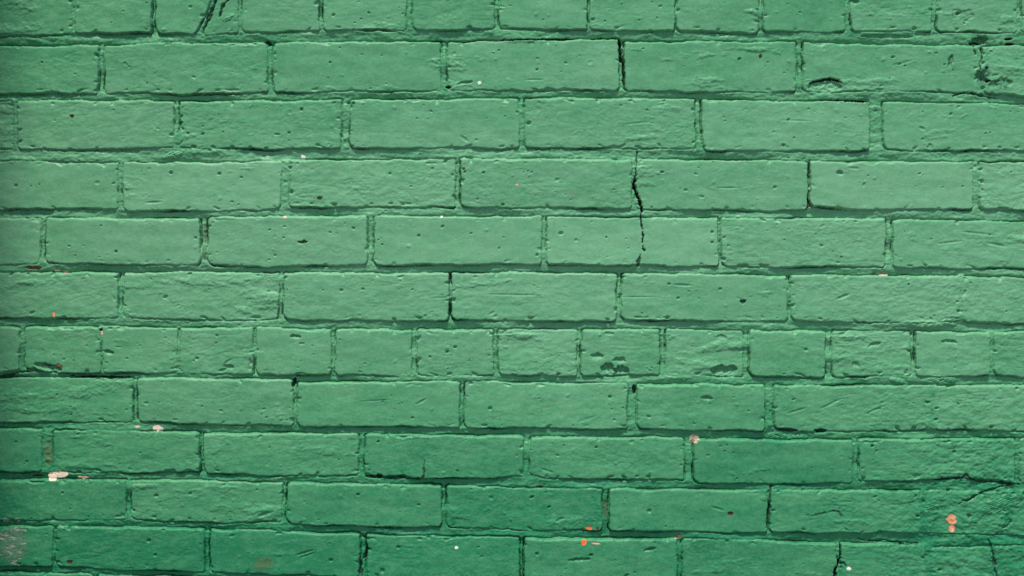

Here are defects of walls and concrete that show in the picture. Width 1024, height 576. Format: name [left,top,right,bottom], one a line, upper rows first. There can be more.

crack [203,0,229,29]
crack [632,151,645,266]
peeling [48,470,90,481]
crack [934,473,1018,503]
peeling [946,514,971,532]